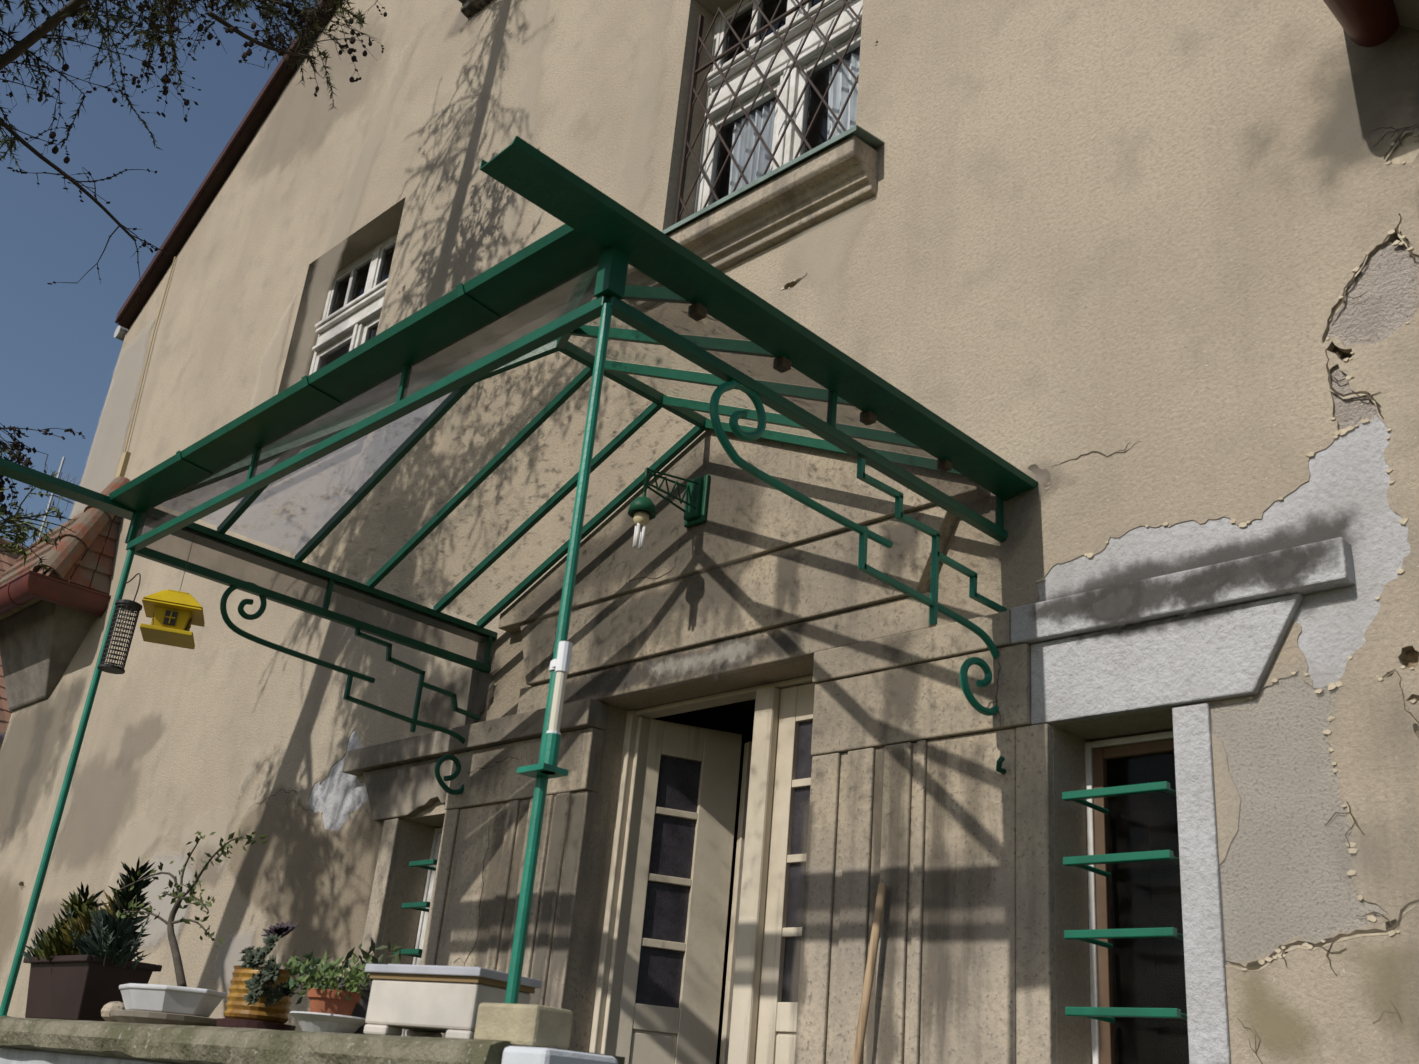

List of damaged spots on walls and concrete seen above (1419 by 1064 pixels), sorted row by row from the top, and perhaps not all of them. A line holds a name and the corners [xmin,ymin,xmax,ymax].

crack [1373,124,1419,161]
crack [1051,441,1139,467]
water stain [521,460,802,703]
water stain [1034,516,1349,638]
spalling [1036,229,1419,971]
water stain [423,660,497,732]
crack [1382,669,1419,726]
peeling [308,730,368,833]
water stain [7,754,71,976]
water stain [108,817,229,902]
crack [1325,801,1365,854]
crack [1225,899,1419,976]